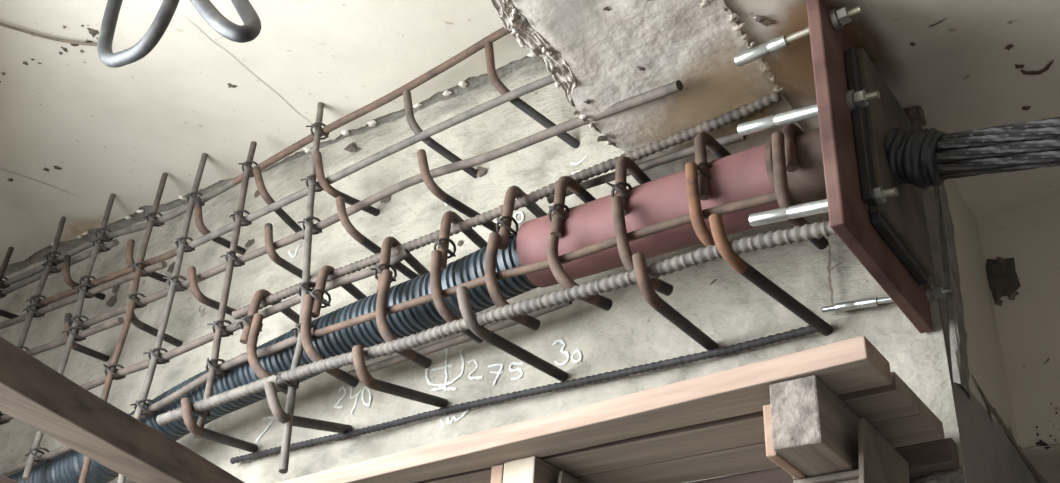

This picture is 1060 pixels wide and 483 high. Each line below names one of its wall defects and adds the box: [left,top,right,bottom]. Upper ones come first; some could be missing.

spalling [59,25,99,55]
spalling [249,0,626,179]
rust [773,0,817,101]
rust [843,21,889,68]
spalling [0,178,233,279]
spalling [986,257,1021,306]
crack [972,375,1042,483]